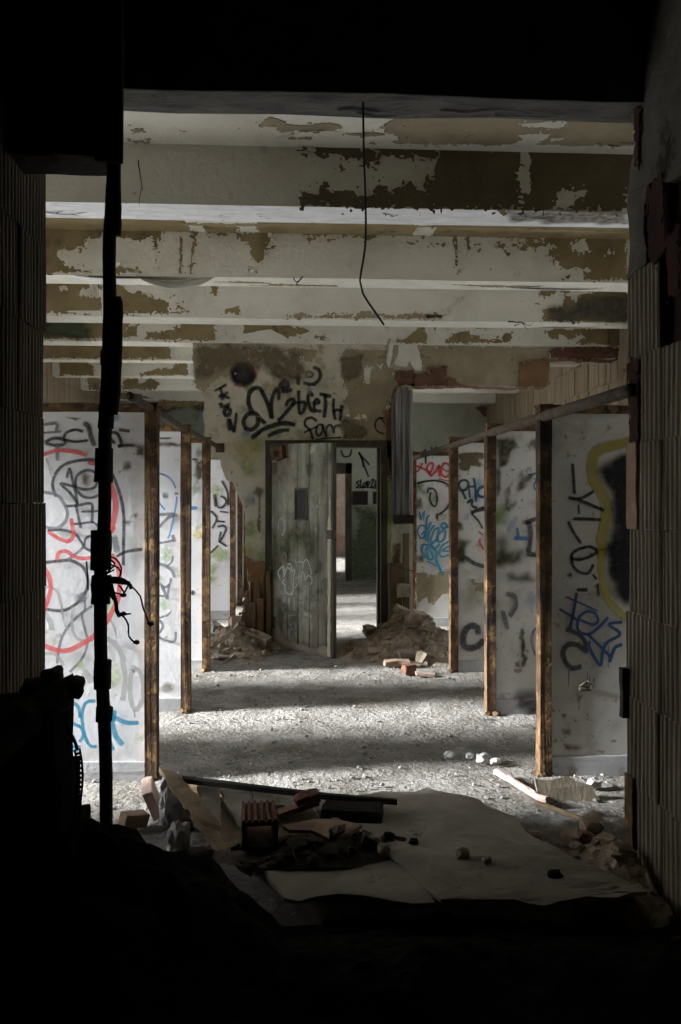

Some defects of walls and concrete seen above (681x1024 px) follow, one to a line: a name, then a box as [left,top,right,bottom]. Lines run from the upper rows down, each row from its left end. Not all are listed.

peeling [116,106,642,480]
spalling [644,172,681,305]
peeling [497,439,533,510]